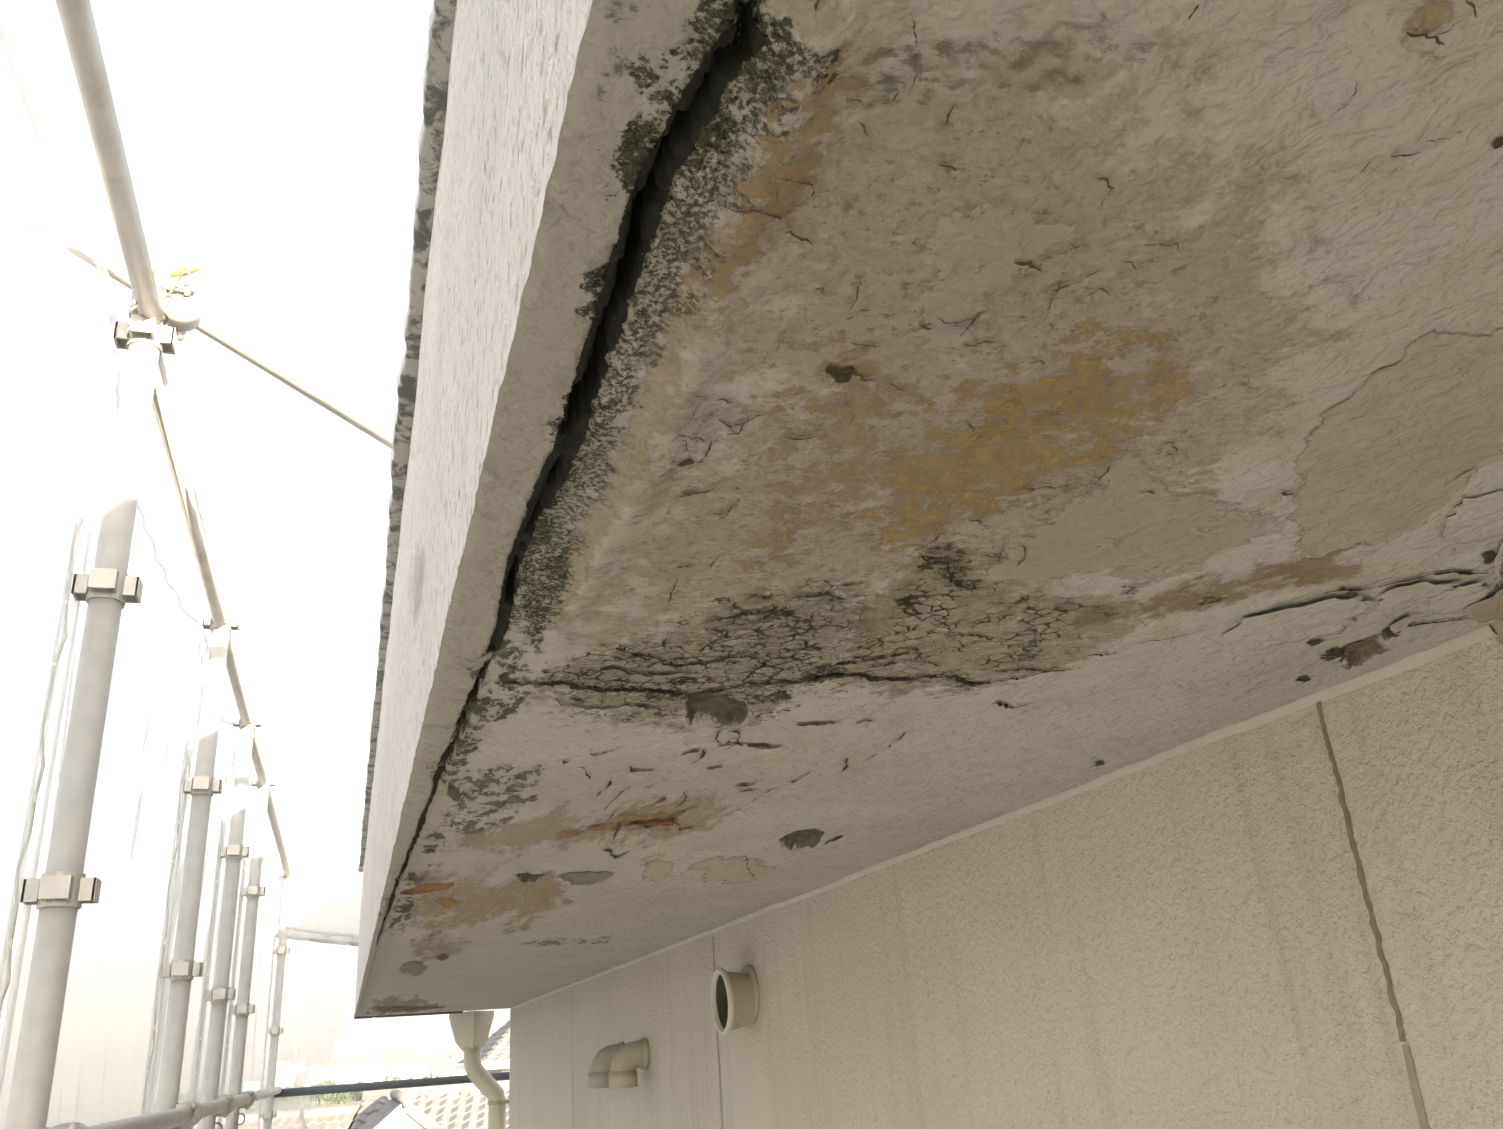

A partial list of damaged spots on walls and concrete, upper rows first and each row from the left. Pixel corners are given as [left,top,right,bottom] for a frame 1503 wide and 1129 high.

crack [1014,160,1179,318]
water stain [389,0,1079,975]
crack [383,0,1140,922]
water stain [714,317,1194,595]
crack [1140,390,1211,494]
crack [1198,596,1226,606]
peeling [1129,541,1503,670]